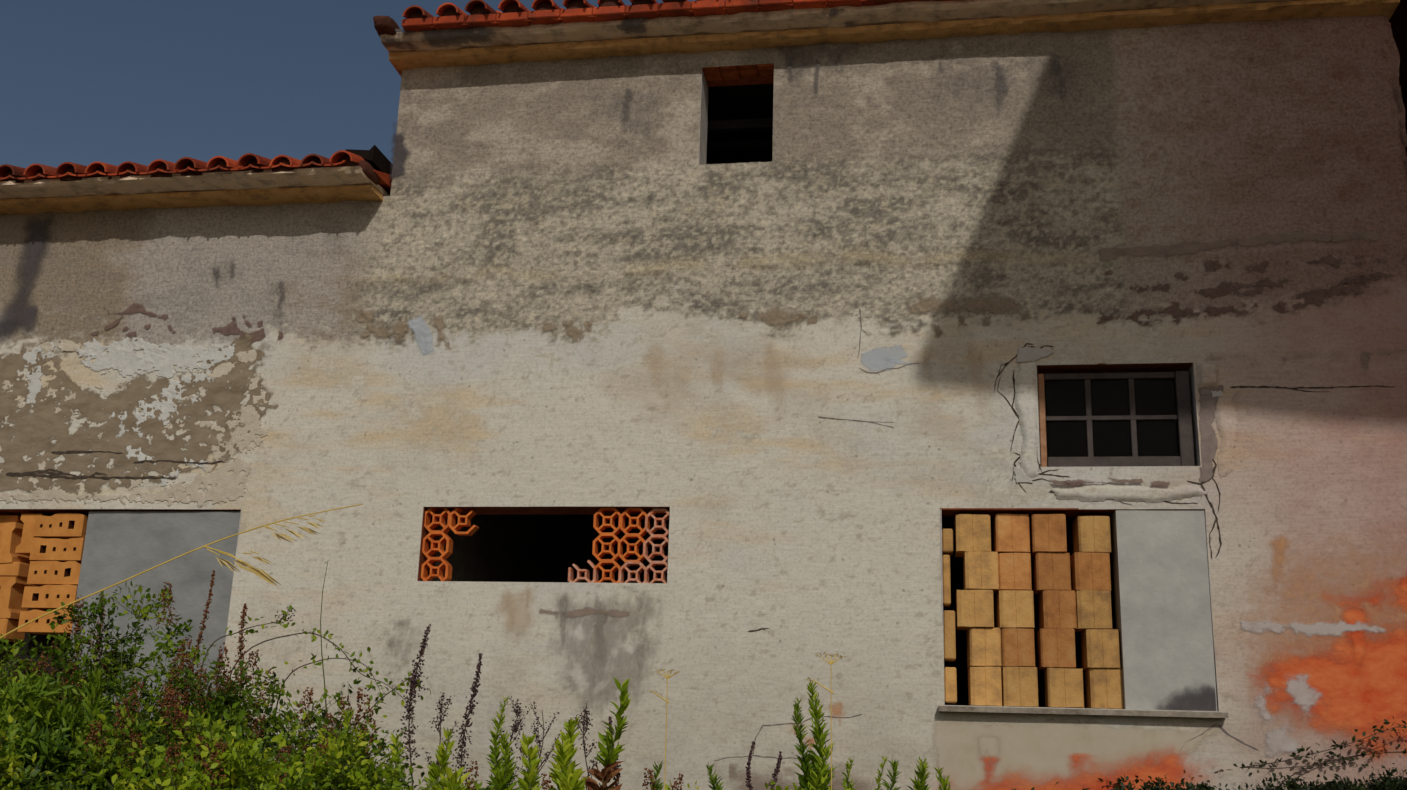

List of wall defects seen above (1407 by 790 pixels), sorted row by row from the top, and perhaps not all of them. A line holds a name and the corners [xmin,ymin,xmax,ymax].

peeling [1097,253,1390,326]
peeling [0,303,283,508]
crack [994,343,1070,493]
crack [1231,384,1394,392]
crack [1165,459,1222,558]
leakage [539,608,629,621]
peeling [1241,621,1385,636]
crack [714,714,862,761]
corrosion [982,754,1191,790]
peeling [1256,688,1298,757]
peeling [1287,675,1321,710]
corrosion [1264,578,1407,754]